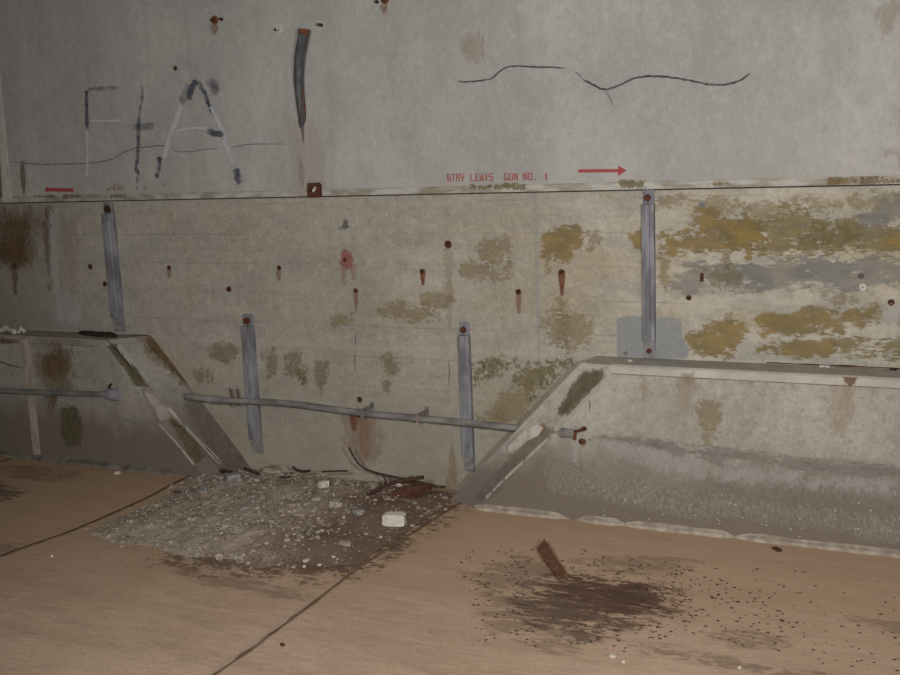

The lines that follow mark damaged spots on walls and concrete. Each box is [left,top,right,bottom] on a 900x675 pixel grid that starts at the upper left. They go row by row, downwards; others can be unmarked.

crack [458,65,750,105]